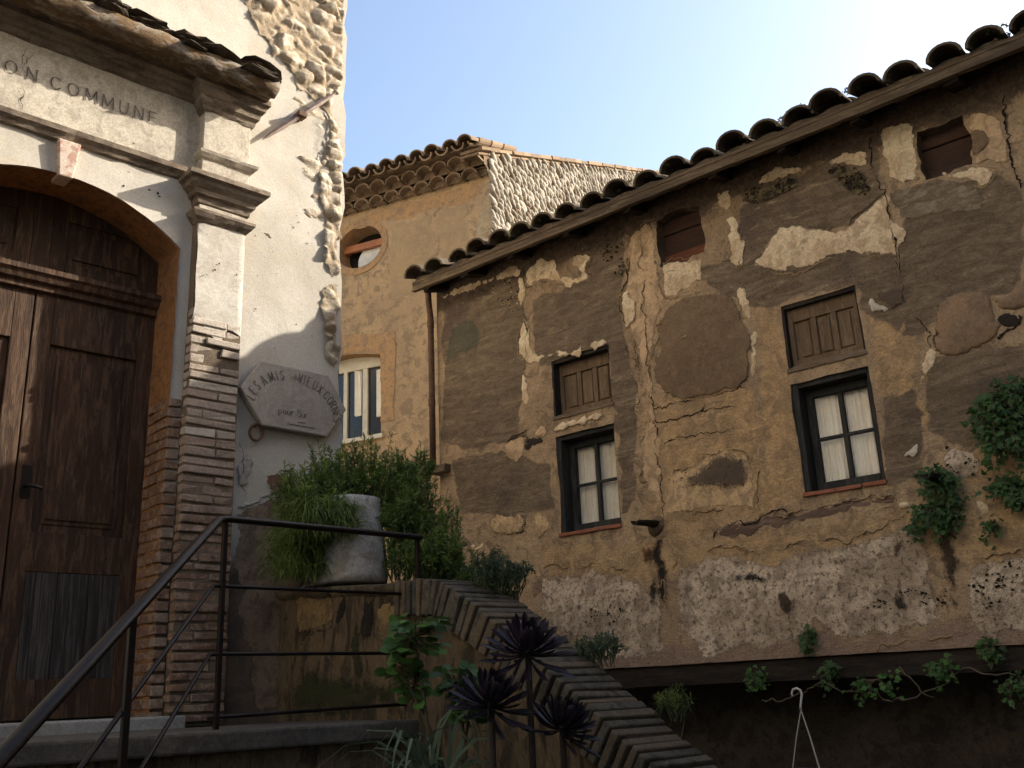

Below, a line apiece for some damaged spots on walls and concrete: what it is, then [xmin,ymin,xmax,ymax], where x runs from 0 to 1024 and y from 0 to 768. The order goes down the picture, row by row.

crack [869,138,886,193]
crack [1002,93,1023,189]
flaking render [718,123,920,312]
flaking render [443,219,758,516]
crack [651,386,746,517]
leakage [649,539,667,603]
flaking render [539,502,954,662]
leakage [778,592,791,613]
leakage [895,588,907,610]